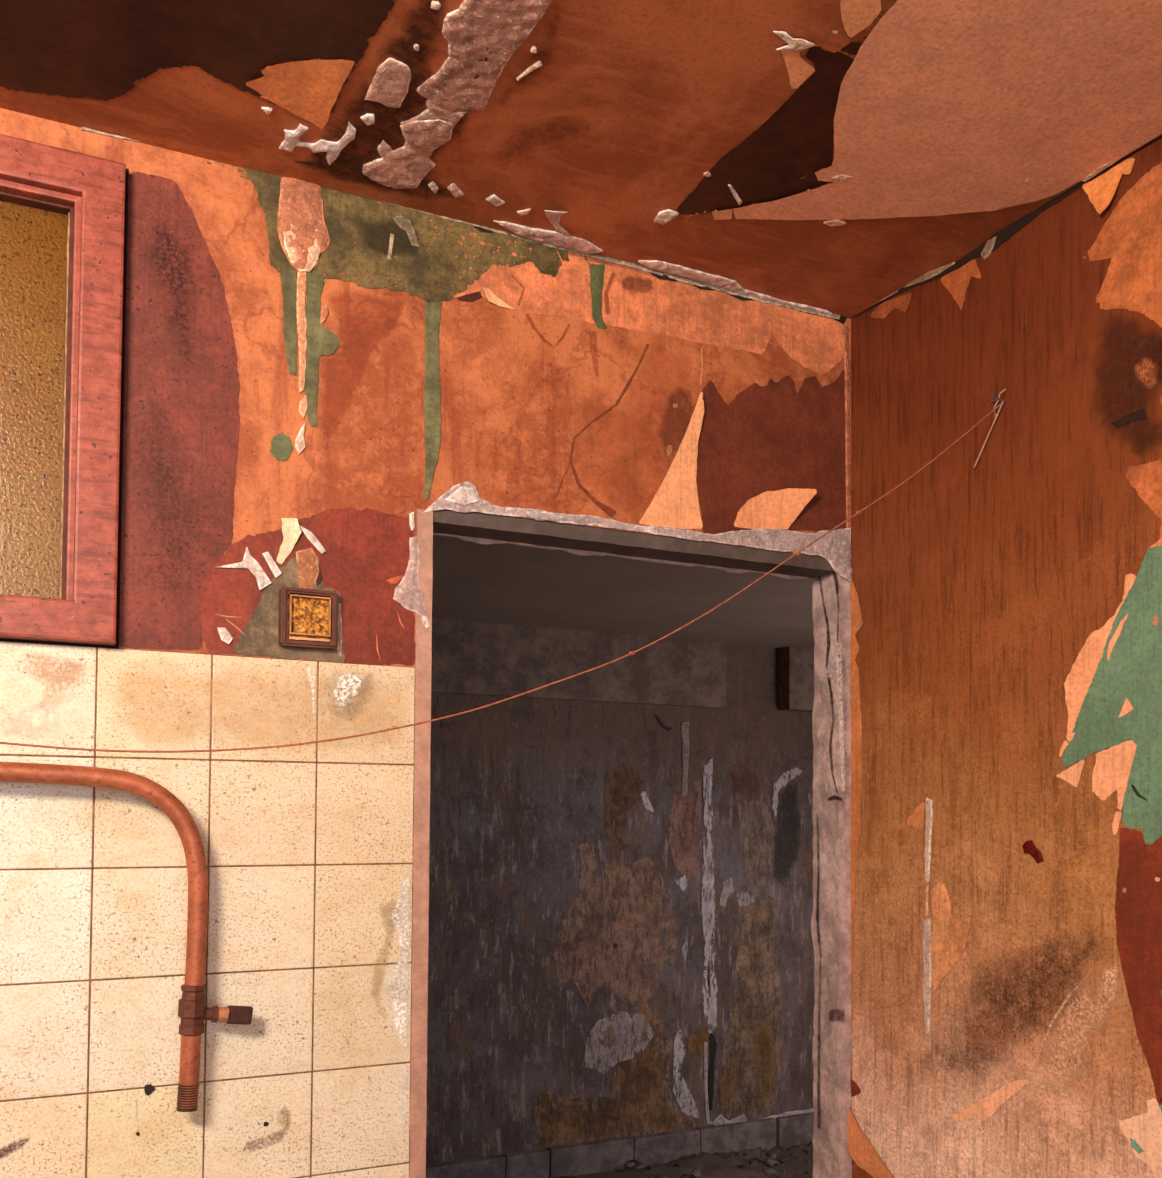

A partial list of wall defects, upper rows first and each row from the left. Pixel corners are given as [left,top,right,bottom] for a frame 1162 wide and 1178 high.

peeling [0,0,395,116]
peeling [279,0,552,198]
peeling [677,37,866,215]
peeling [207,160,852,628]
water stain [515,279,569,345]
water stain [604,273,652,314]
peeling [215,518,345,713]
peeling [1056,537,1162,845]
water stain [949,941,1093,1066]